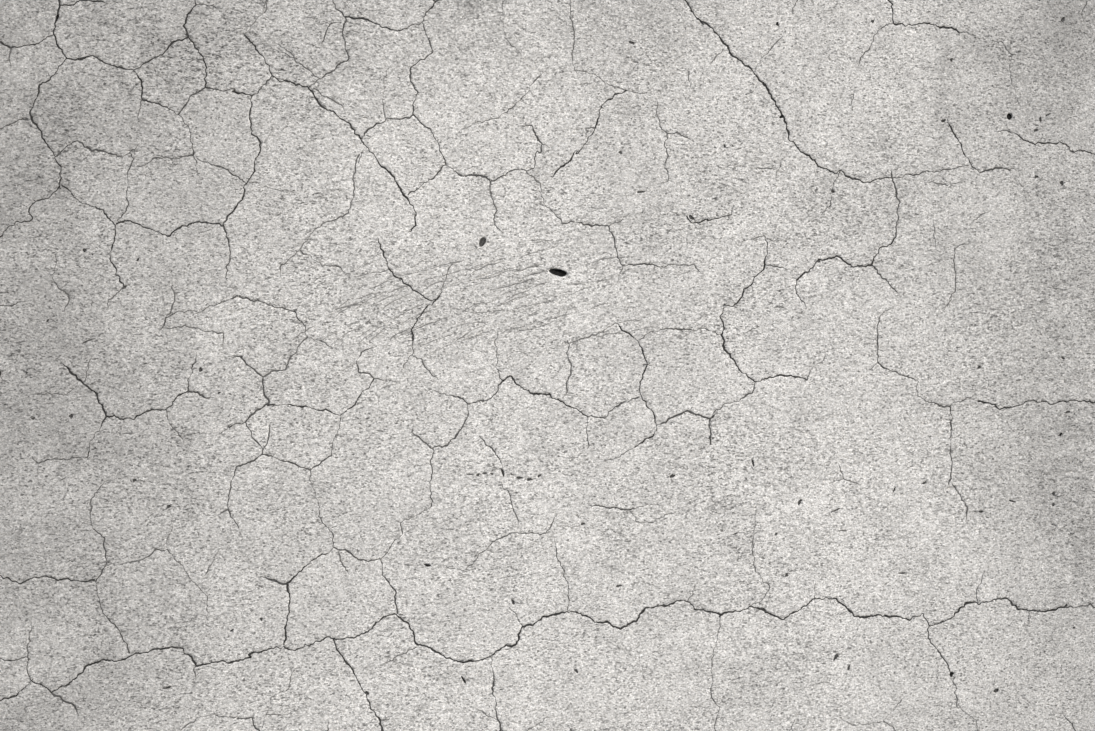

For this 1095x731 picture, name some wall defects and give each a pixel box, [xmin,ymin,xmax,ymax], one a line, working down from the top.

crack [0,0,700,312]
crack [0,235,1095,731]
crack [670,204,734,223]
crack [685,0,1095,518]